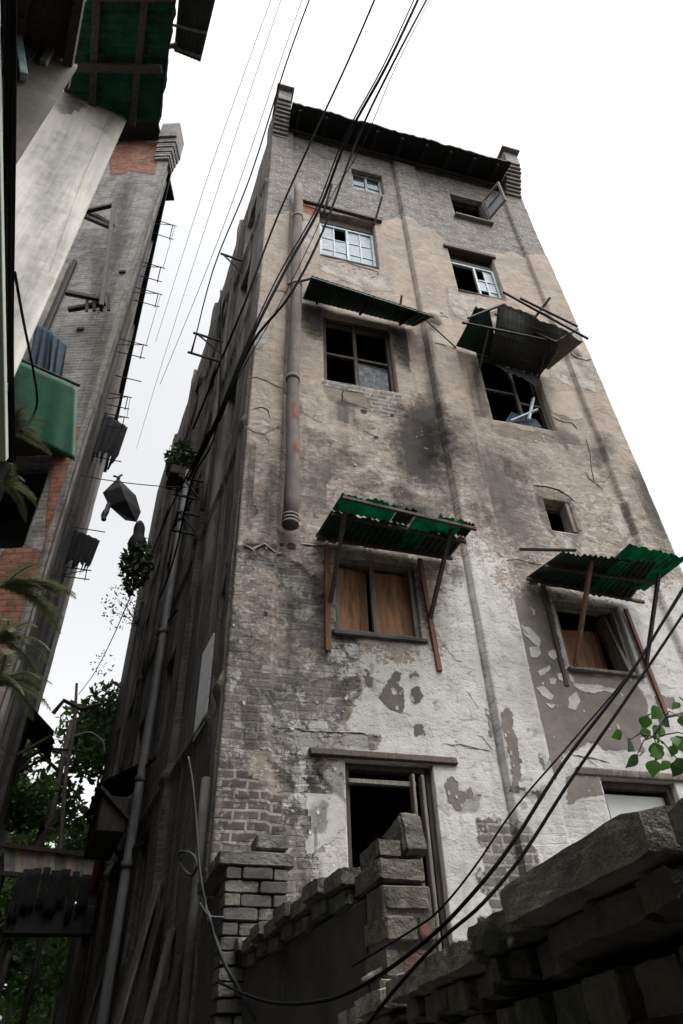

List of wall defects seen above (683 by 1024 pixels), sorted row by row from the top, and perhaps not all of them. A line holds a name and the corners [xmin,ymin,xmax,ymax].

spalling [302,218,396,293]
crack [533,416,609,501]
peeling [363,668,424,713]
peeling [515,592,676,804]
peeling [444,776,481,811]
peeling [485,707,542,798]
flaking render [475,814,539,922]